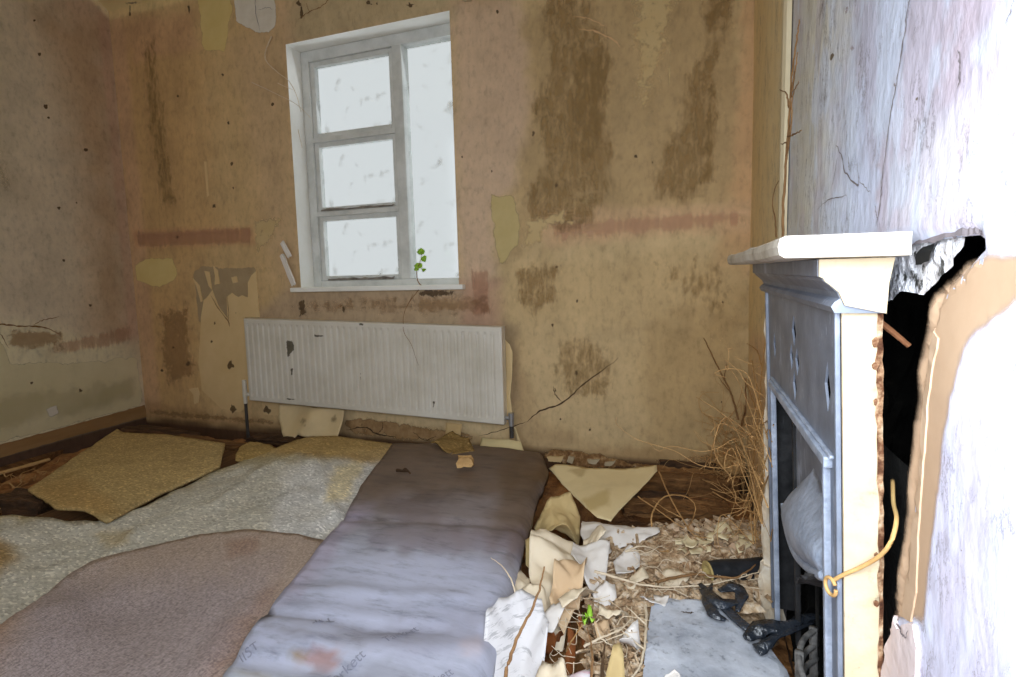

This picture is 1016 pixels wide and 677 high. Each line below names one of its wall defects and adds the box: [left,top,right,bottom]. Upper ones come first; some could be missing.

leakage [530,0,613,229]
leakage [658,0,730,199]
crack [0,316,61,345]
peeling [0,342,142,442]
peeling [189,265,265,413]
crack [481,358,618,436]